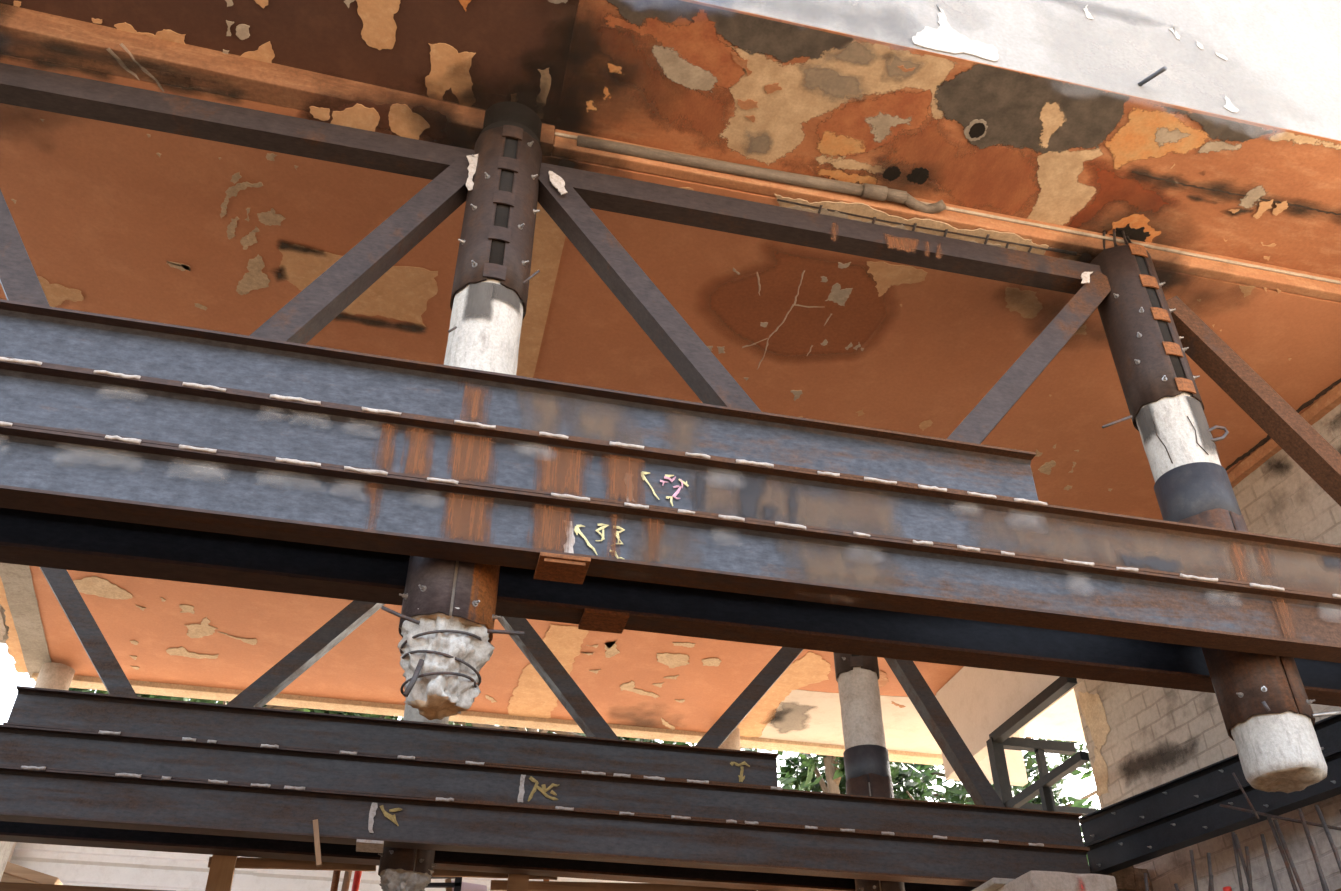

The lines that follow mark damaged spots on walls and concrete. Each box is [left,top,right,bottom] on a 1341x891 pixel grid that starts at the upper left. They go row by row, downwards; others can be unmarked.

peeling [223,0,275,63]
peeling [309,103,430,140]
peeling [344,0,401,50]
peeling [425,43,476,101]
spalling [592,0,1341,225]
crack [742,270,832,369]
leakage [706,247,889,358]
rust [366,423,431,530]
rust [445,384,495,544]
rust [533,395,585,552]
rust [575,410,642,556]
rust [703,478,892,532]